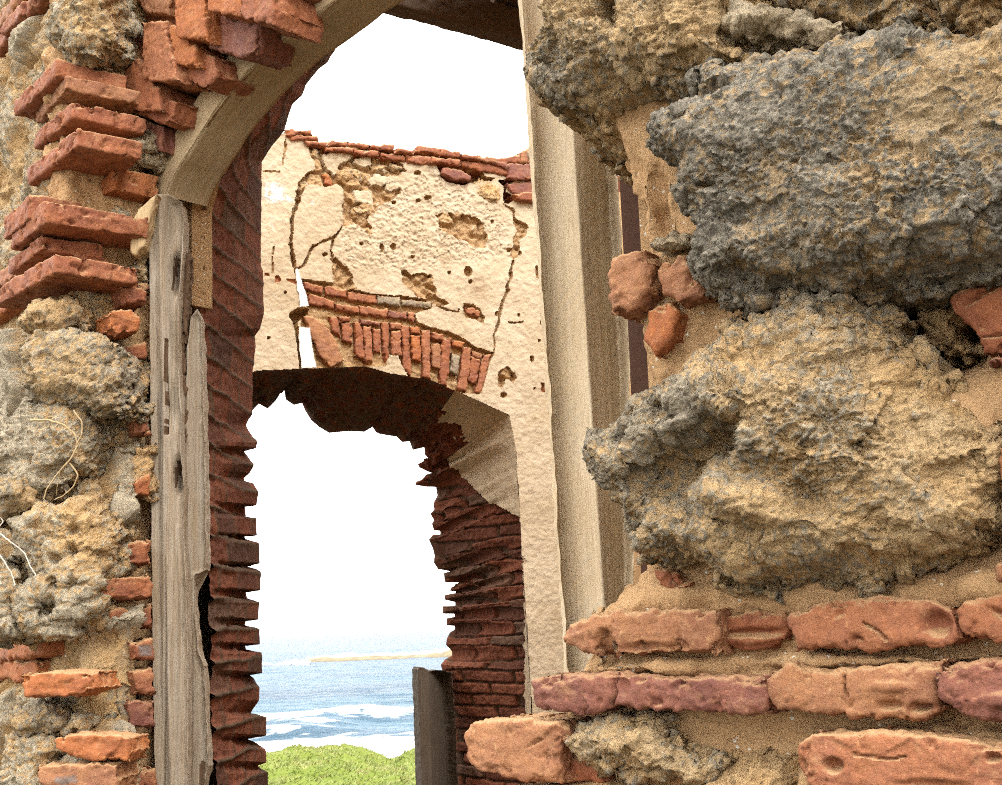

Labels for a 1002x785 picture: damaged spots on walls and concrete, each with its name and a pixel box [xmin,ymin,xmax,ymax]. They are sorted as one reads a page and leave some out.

spalling [295,145,421,246]
spalling [451,166,495,204]
crack [271,195,343,273]
spalling [435,212,494,248]
spalling [401,269,449,307]
crack [437,304,460,312]
spalling [462,303,498,324]
crack [491,260,524,355]
crack [289,307,309,372]